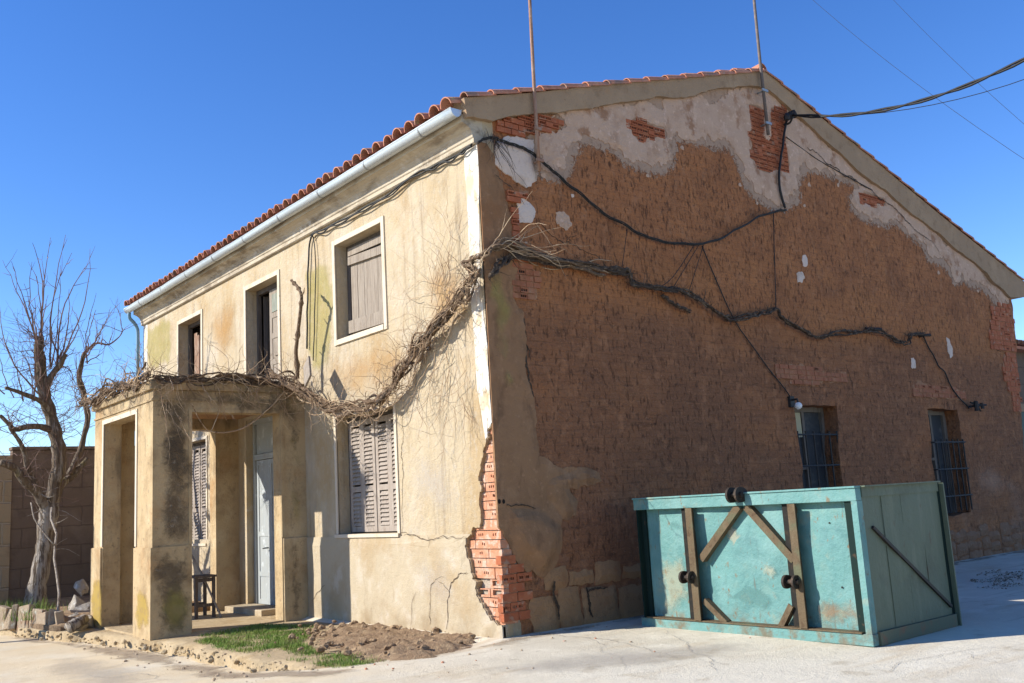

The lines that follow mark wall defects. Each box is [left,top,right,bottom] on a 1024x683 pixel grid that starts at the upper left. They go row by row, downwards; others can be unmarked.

flaking render [494,87,1023,413]
damp [163,404,188,535]
spalling [469,428,533,625]
damp [157,563,187,626]
crack [410,572,467,629]